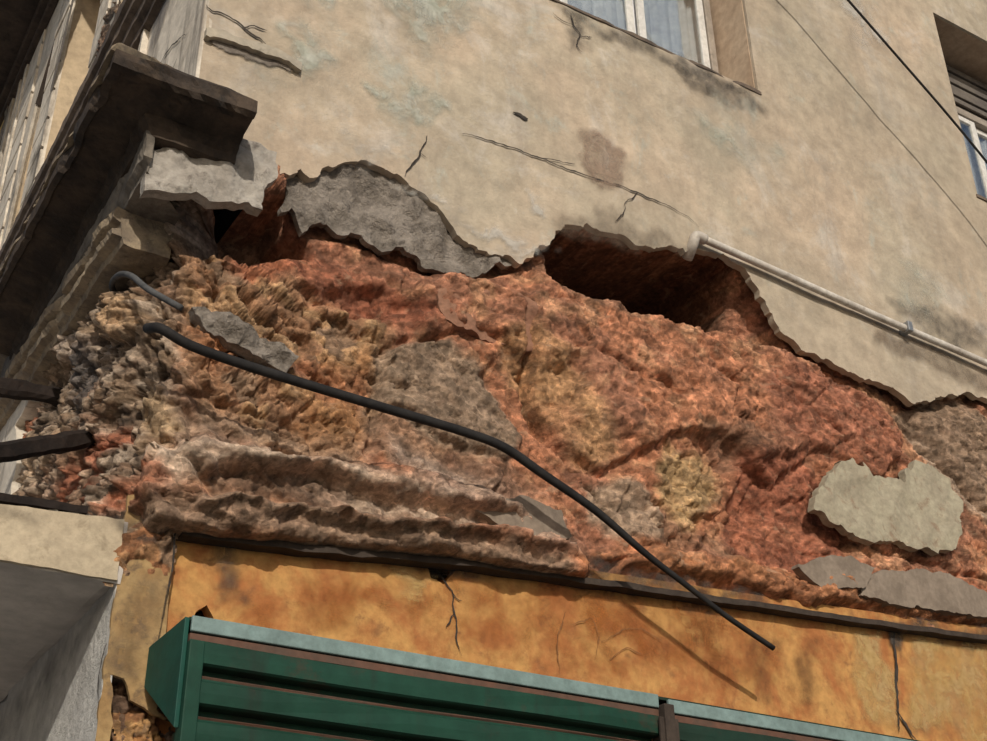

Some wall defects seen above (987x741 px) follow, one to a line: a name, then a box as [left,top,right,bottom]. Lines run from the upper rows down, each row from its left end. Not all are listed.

spalling [95,0,120,56]
crack [207,6,267,44]
peeling [843,1,887,41]
crack [404,136,427,177]
crack [463,133,699,227]
spalling [7,131,987,627]
crack [442,575,462,655]
spalling [110,676,176,741]
crack [893,632,916,739]